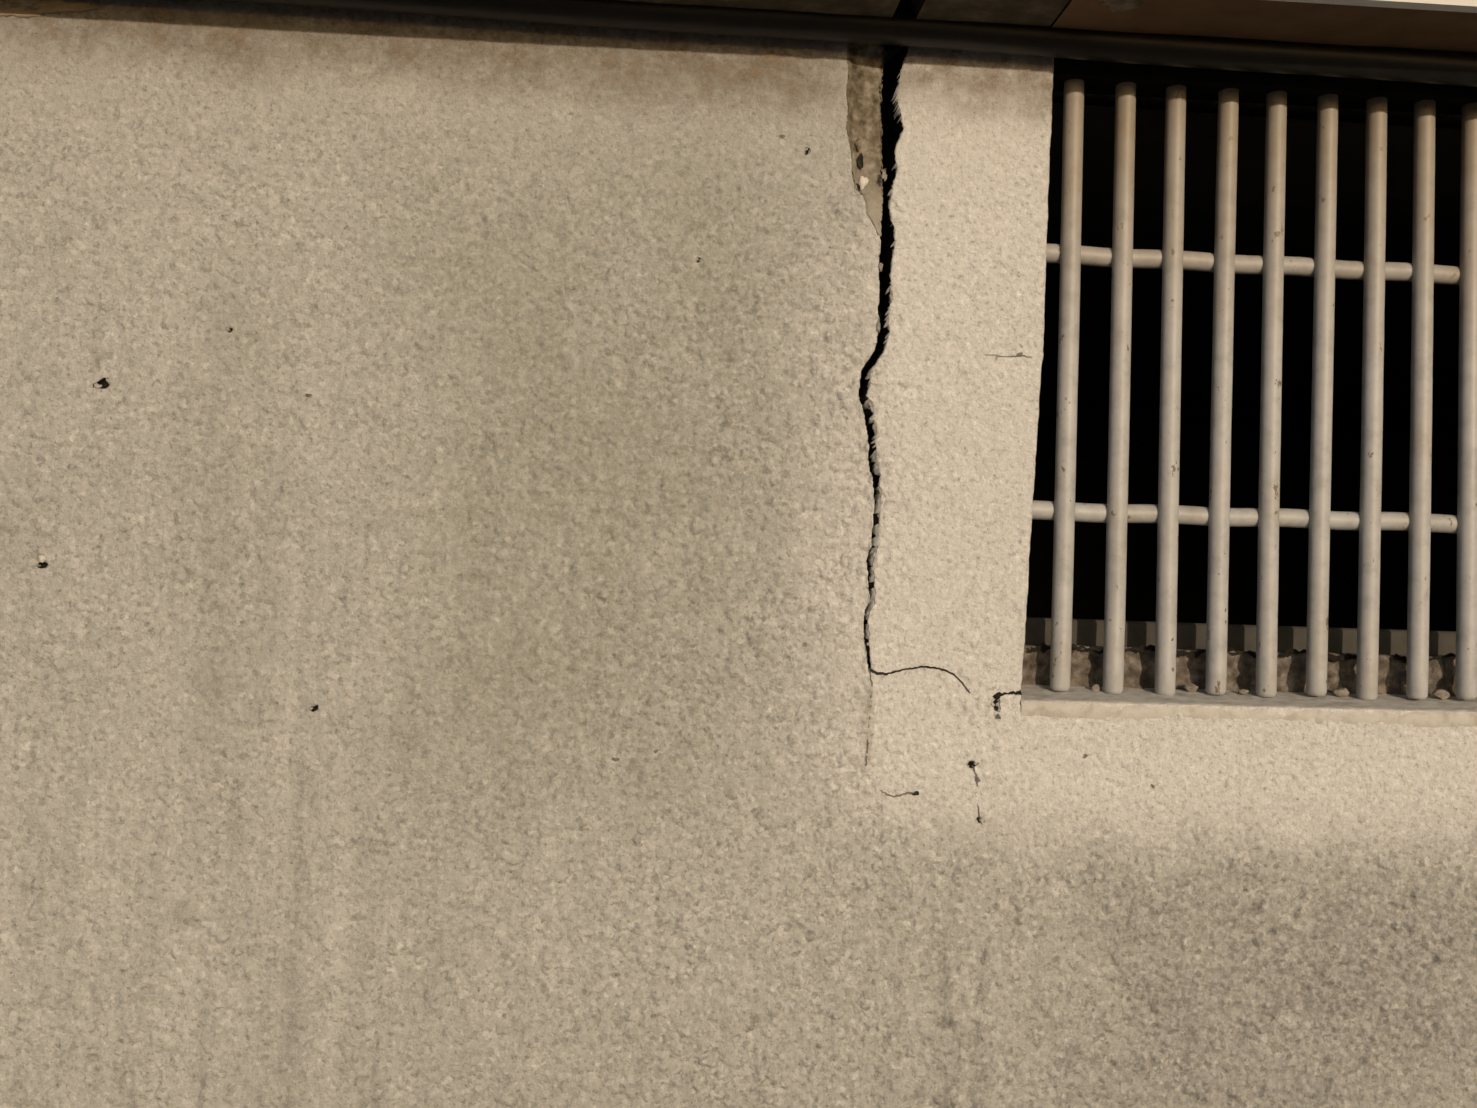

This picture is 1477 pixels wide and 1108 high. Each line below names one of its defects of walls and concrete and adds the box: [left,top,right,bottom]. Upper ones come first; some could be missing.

spalling [846,43,885,236]
crack [859,0,970,798]
crack [972,765,983,825]